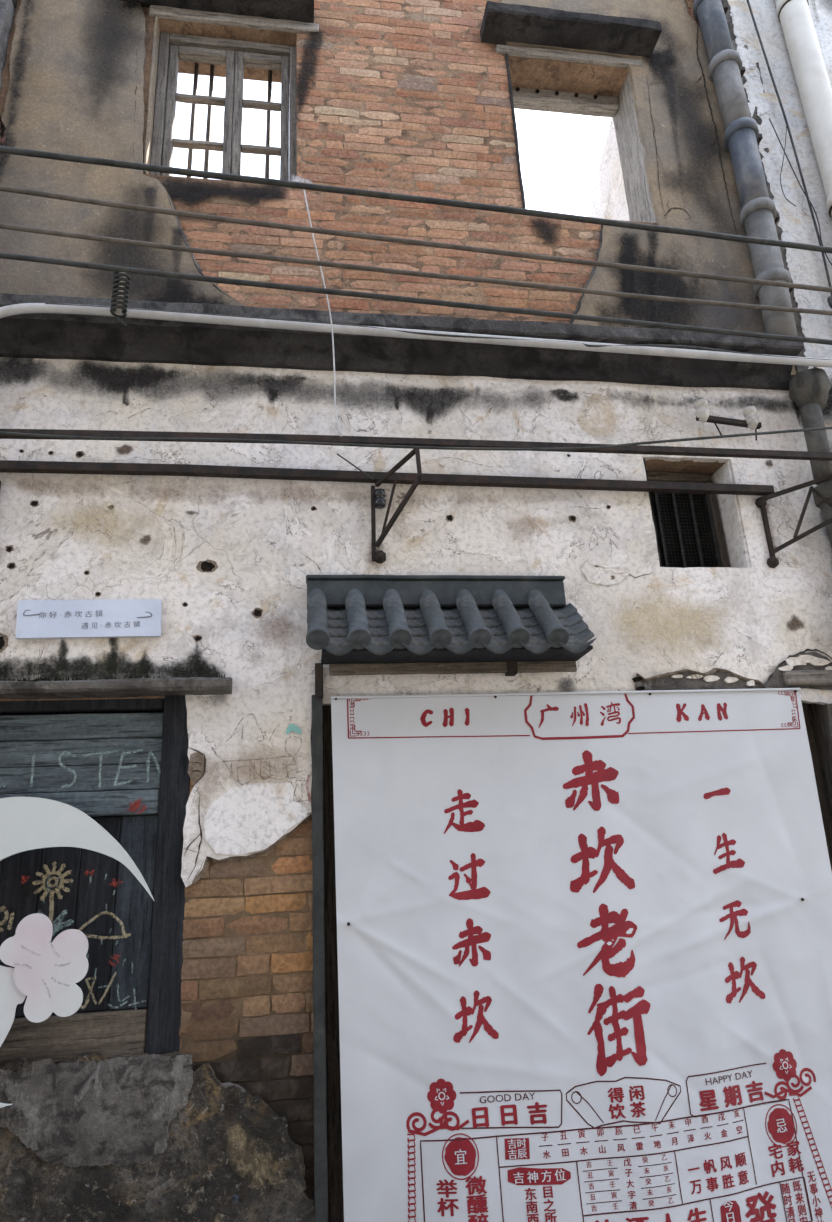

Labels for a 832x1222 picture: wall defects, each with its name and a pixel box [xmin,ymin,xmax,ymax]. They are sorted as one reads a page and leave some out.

damp [0,0,34,179]
flaking render [161,0,603,324]
damp [531,219,560,242]
damp [600,231,757,330]
damp [0,357,506,432]
damp [522,389,578,404]
damp [57,639,68,670]
damp [107,638,118,671]
damp [141,652,151,671]
damp [559,679,573,692]
spalling [762,649,832,690]
flaking render [179,782,315,1204]